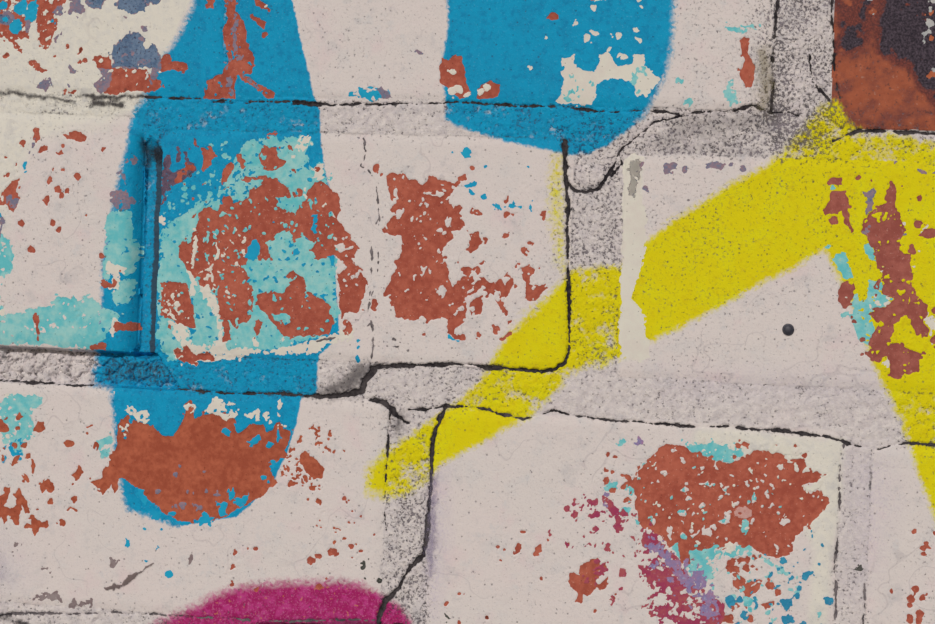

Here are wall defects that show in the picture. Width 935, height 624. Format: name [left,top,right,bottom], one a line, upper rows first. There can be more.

peeling [0,0,188,95]
peeling [439,55,500,99]
peeling [556,32,660,107]
crack [770,0,780,63]
peeling [155,131,548,367]
peeling [823,175,935,379]
crack [145,81,935,624]
peeling [0,393,78,536]
peeling [72,396,345,531]
peeling [564,436,829,624]
crack [10,609,123,617]